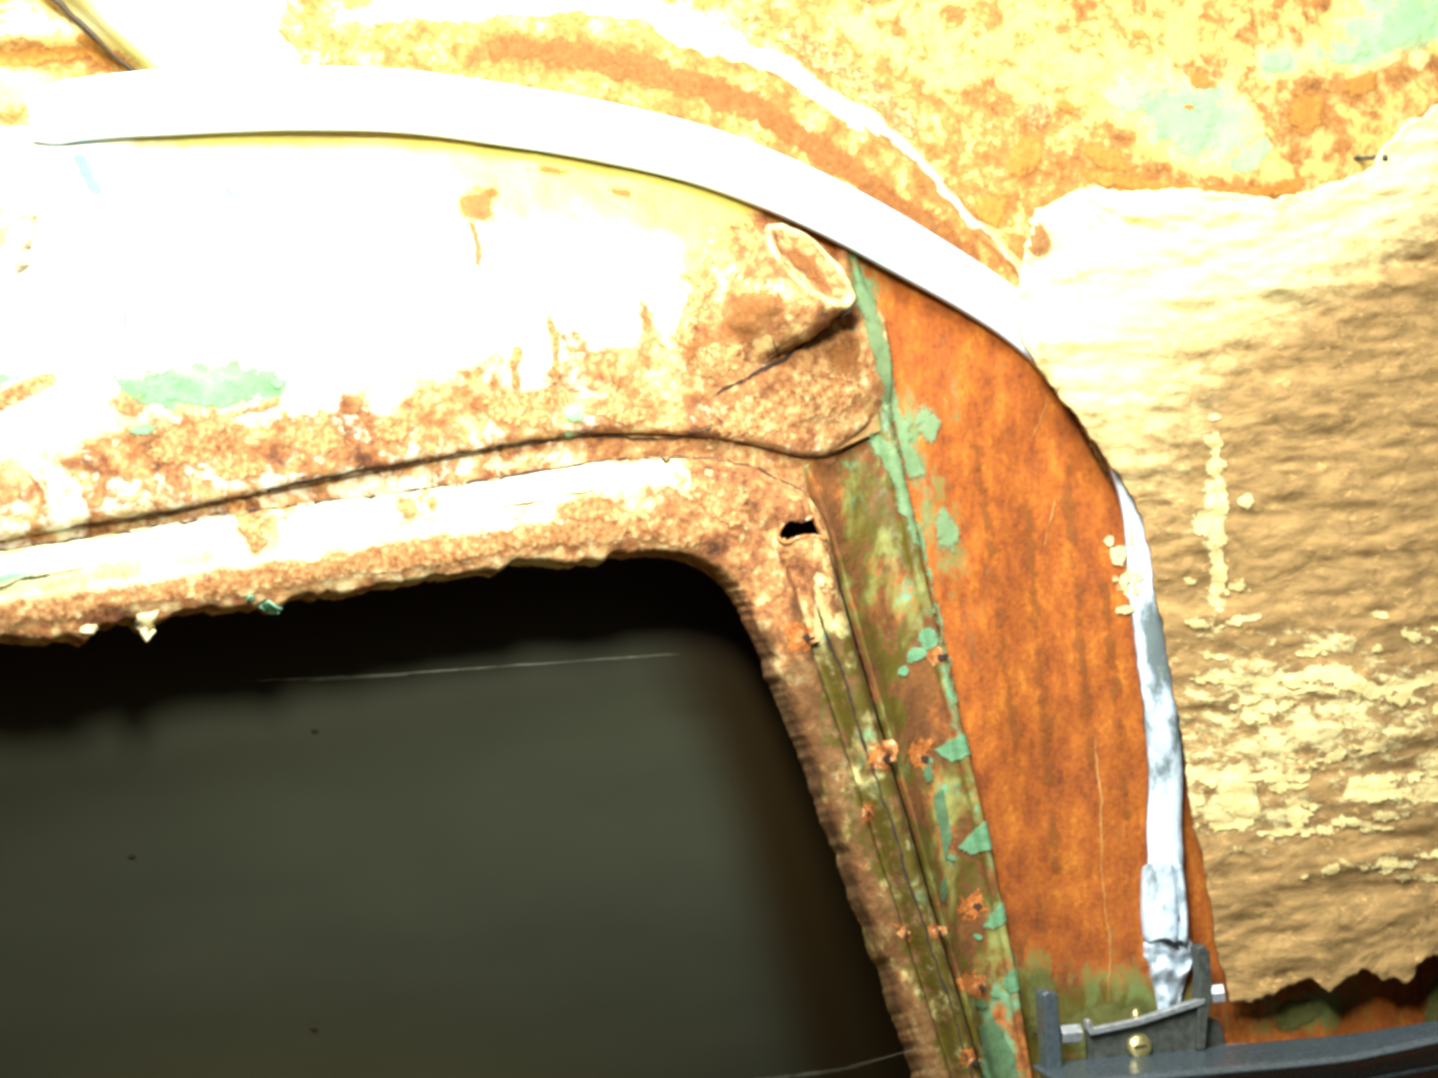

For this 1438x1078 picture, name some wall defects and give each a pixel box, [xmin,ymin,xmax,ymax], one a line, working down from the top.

corrosion [486,33,979,261]
peeling [1102,75,1272,173]
corrosion [459,186,499,266]
corrosion [0,372,57,410]
corrosion [470,314,658,432]
corrosion [675,273,782,379]
corrosion [706,337,870,451]
peeling [853,275,959,703]
corrosion [0,474,767,636]
peeling [924,732,993,903]
peeling [973,901,1007,940]
peeling [975,966,1019,1078]